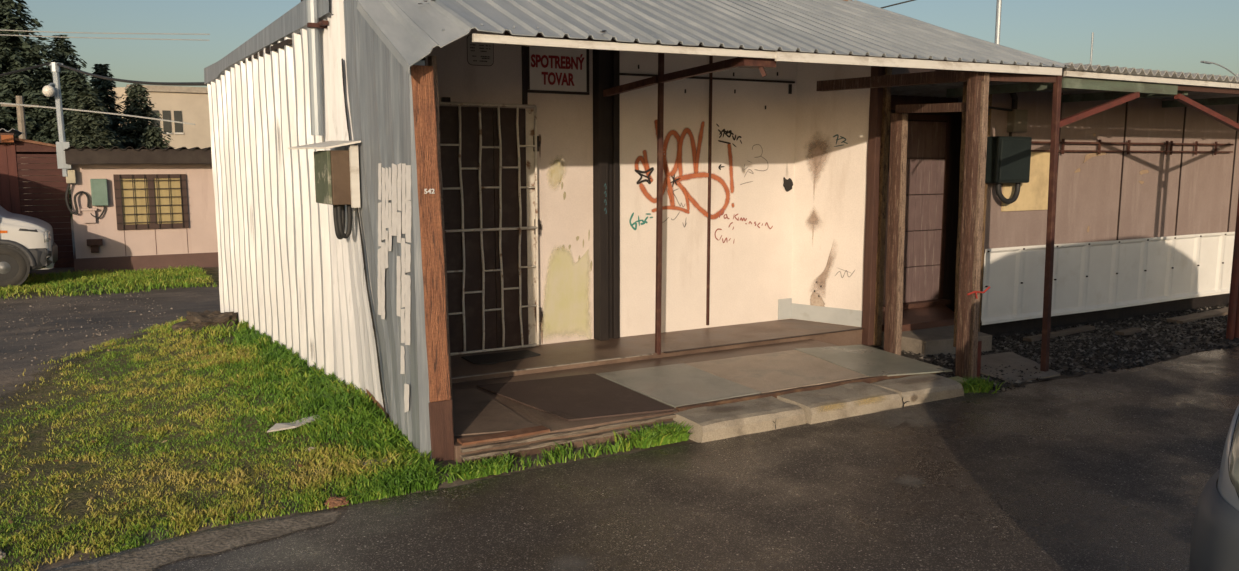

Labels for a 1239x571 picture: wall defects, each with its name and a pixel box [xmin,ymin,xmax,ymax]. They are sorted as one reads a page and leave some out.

leakage [807,141,828,190]
peeling [543,231,592,339]
leakage [815,257,831,288]